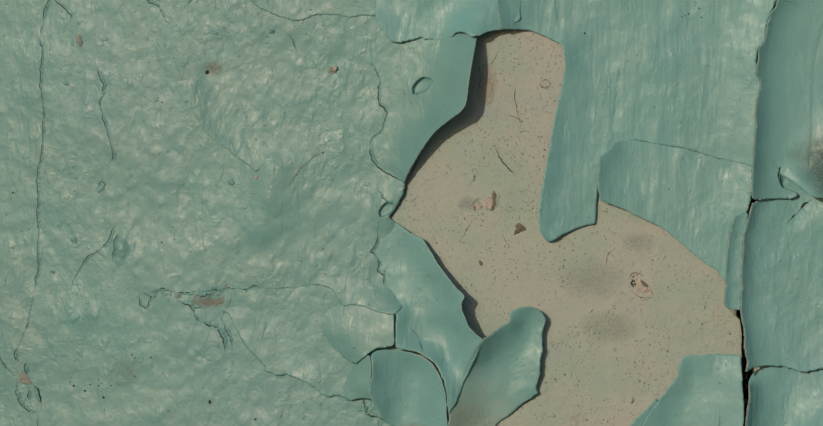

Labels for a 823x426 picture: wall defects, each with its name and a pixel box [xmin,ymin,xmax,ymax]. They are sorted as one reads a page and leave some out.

crack [18,0,73,347]
crack [91,51,117,162]
spalling [139,284,234,309]
crack [147,284,310,352]
peeling [191,63,270,172]
crack [370,221,386,286]
crack [369,63,404,202]
peeling [222,0,823,426]
crack [736,310,753,426]